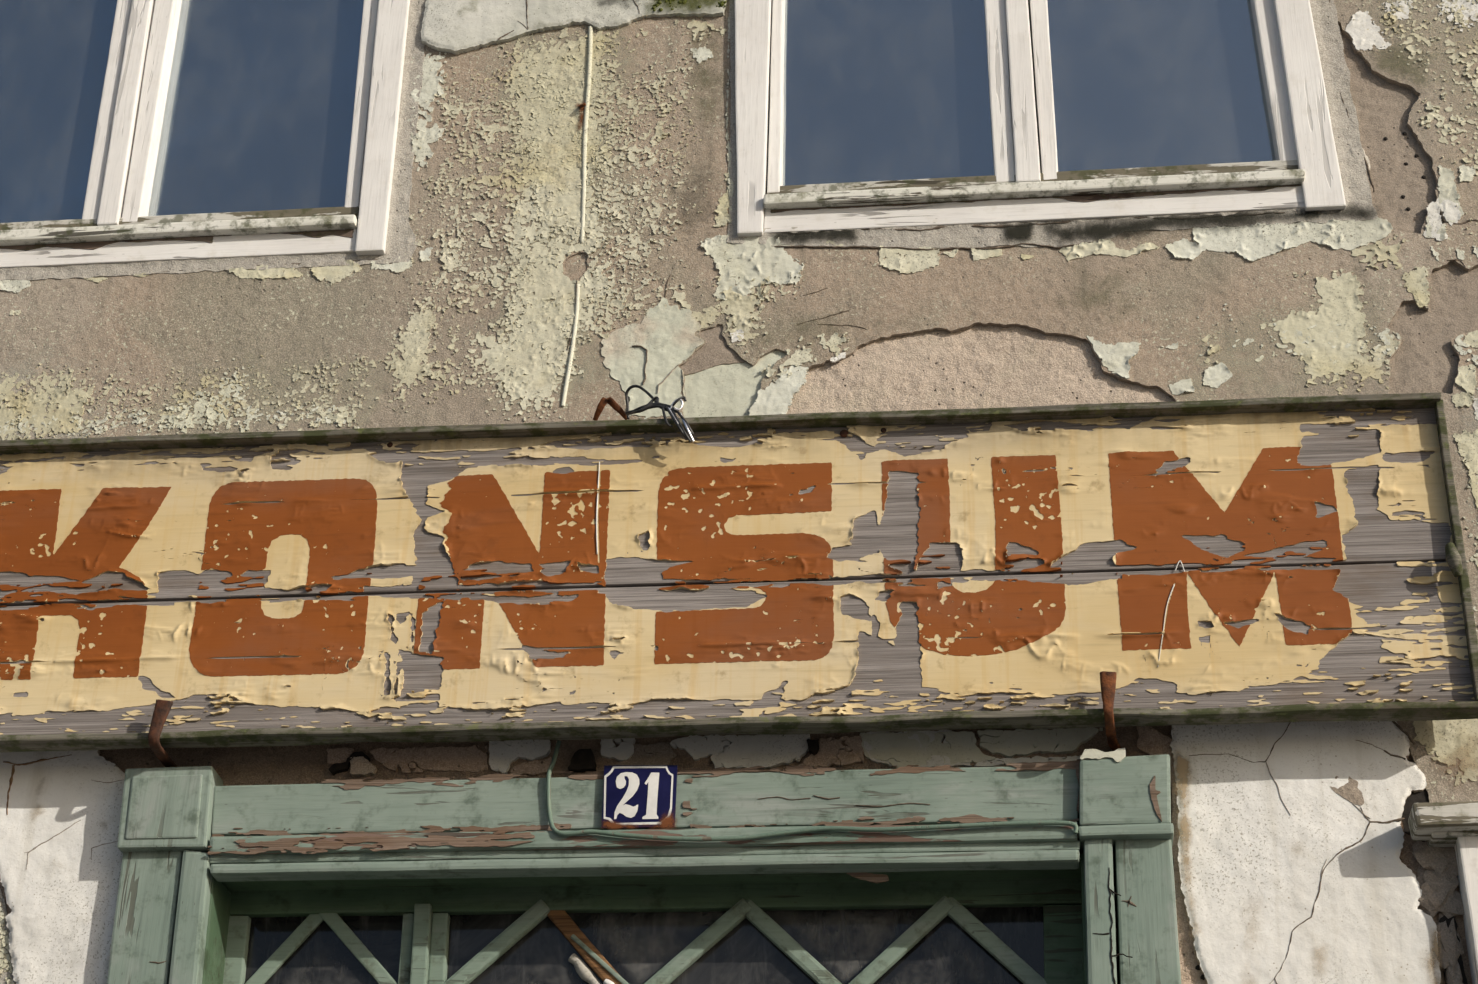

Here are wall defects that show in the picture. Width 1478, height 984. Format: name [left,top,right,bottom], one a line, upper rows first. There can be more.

spalling [0,0,1478,567]
crack [3,755,124,815]
crack [1189,723,1291,816]
crack [1355,721,1416,760]
peeling [1407,719,1478,786]
crack [25,820,118,869]
spalling [99,725,1207,984]
crack [1272,804,1404,984]
spalling [1399,789,1468,984]